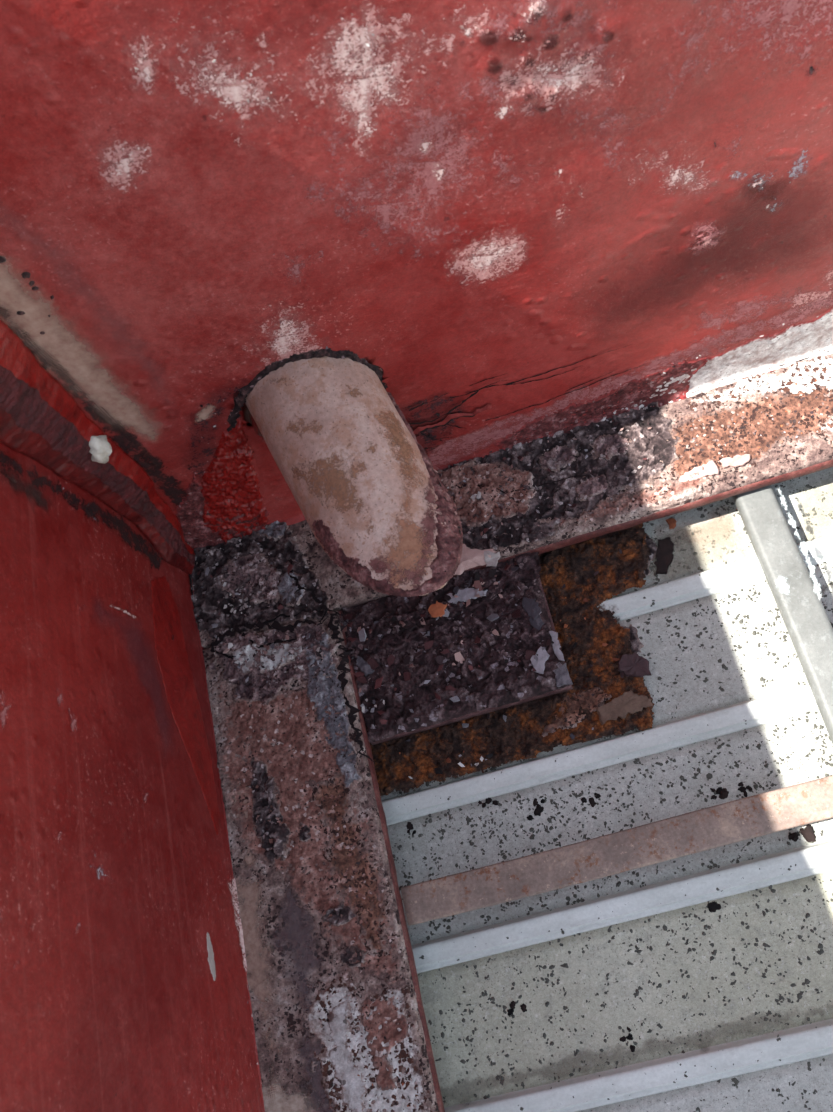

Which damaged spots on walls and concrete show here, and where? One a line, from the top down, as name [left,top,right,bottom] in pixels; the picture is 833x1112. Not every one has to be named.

water stain [0,255,187,506]
peeling [401,265,833,470]
mould [0,451,164,571]
crack [189,559,375,764]
corrosion [175,384,833,1091]
corrosion [262,1084,311,1112]